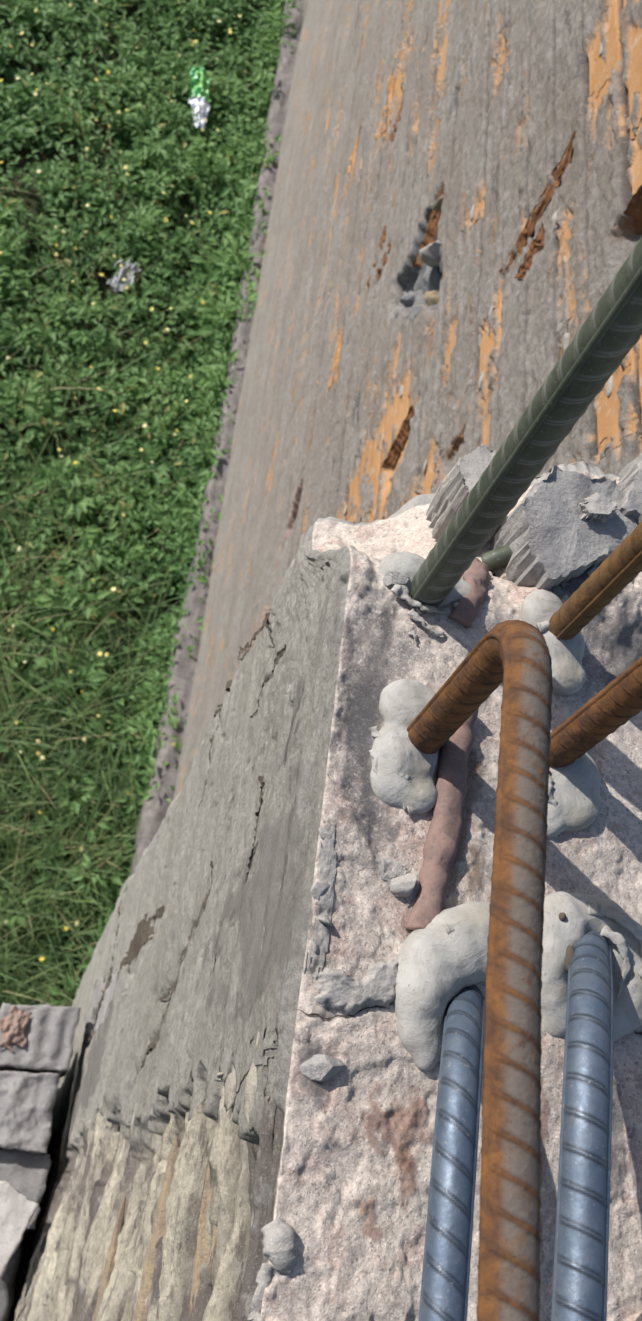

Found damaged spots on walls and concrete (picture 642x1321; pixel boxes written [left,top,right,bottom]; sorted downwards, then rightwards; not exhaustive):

peeling [579,0,642,154]
spalling [367,184,444,322]
peeling [499,131,576,351]
spalling [608,185,642,235]
peeling [340,373,464,524]
peeling [464,298,499,394]
spalling [579,492,618,523]
peeling [579,353,642,458]
spalling [551,566,597,598]
crack [198,608,286,810]
peeling [302,822,337,994]
peeling [375,853,419,906]